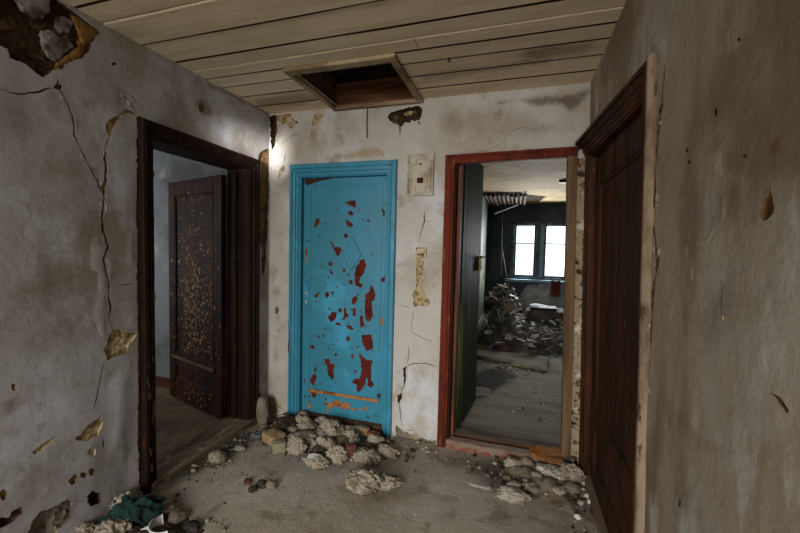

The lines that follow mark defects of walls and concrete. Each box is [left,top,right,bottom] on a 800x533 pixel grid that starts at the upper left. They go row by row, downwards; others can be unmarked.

spalling [0,0,99,77]
spalling [388,106,422,127]
crack [0,77,133,329]
spalling [759,187,775,221]
spalling [413,257,431,307]
spalling [103,249,141,491]
crack [398,306,435,440]
spalling [75,416,104,457]
spalling [68,468,95,485]
spalling [0,506,23,528]
spalling [28,498,74,533]
spalling [87,490,101,506]